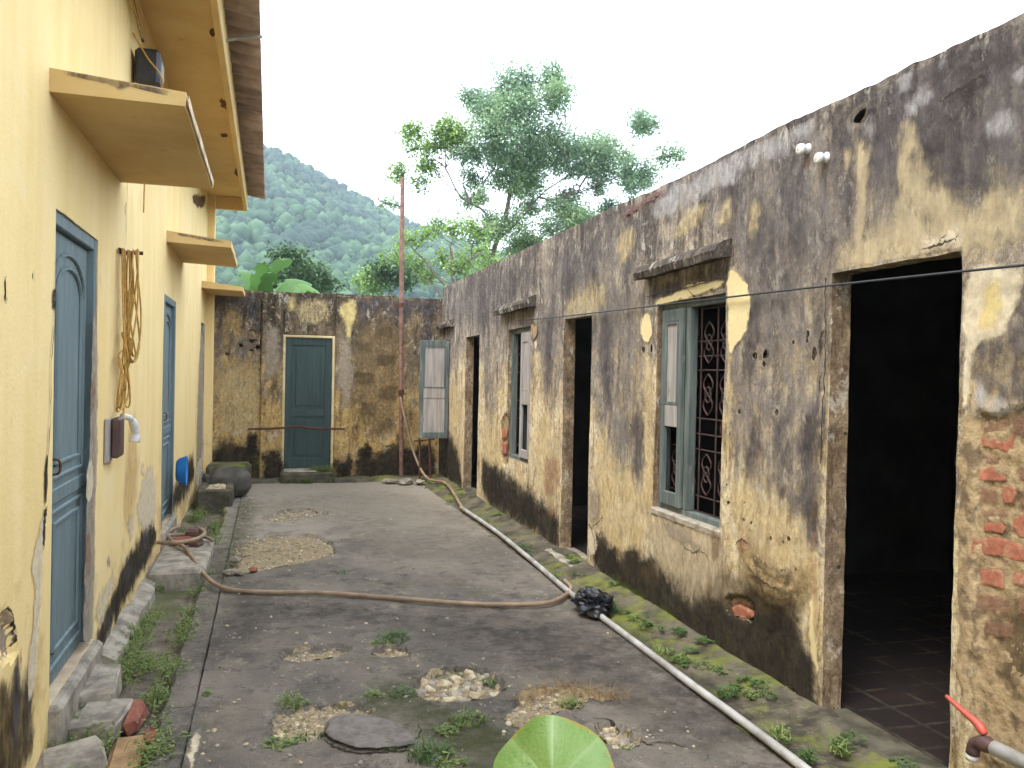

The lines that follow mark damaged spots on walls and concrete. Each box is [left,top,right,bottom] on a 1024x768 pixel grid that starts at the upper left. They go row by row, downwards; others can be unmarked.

damp [720,35,1024,277]
peeling [0,519,43,699]
damp [97,523,156,643]
damp [212,432,285,478]
damp [481,459,559,545]
damp [594,534,819,705]
spalling [731,595,755,620]
damp [735,287,825,547]
spalling [955,407,1024,754]
spalling [971,751,1016,768]